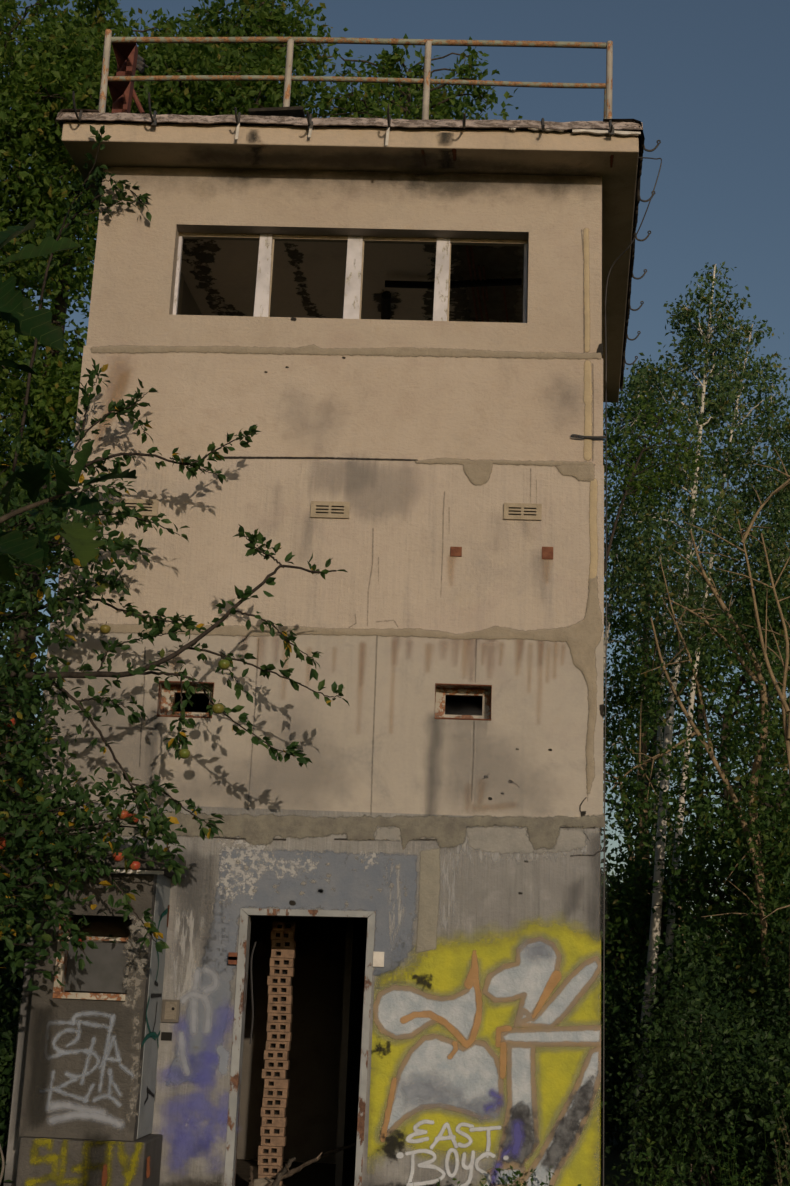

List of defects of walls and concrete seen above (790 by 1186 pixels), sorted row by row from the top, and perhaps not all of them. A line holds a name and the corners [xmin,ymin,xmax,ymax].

peeling [166,826,418,1086]
flaking render [441,811,587,930]